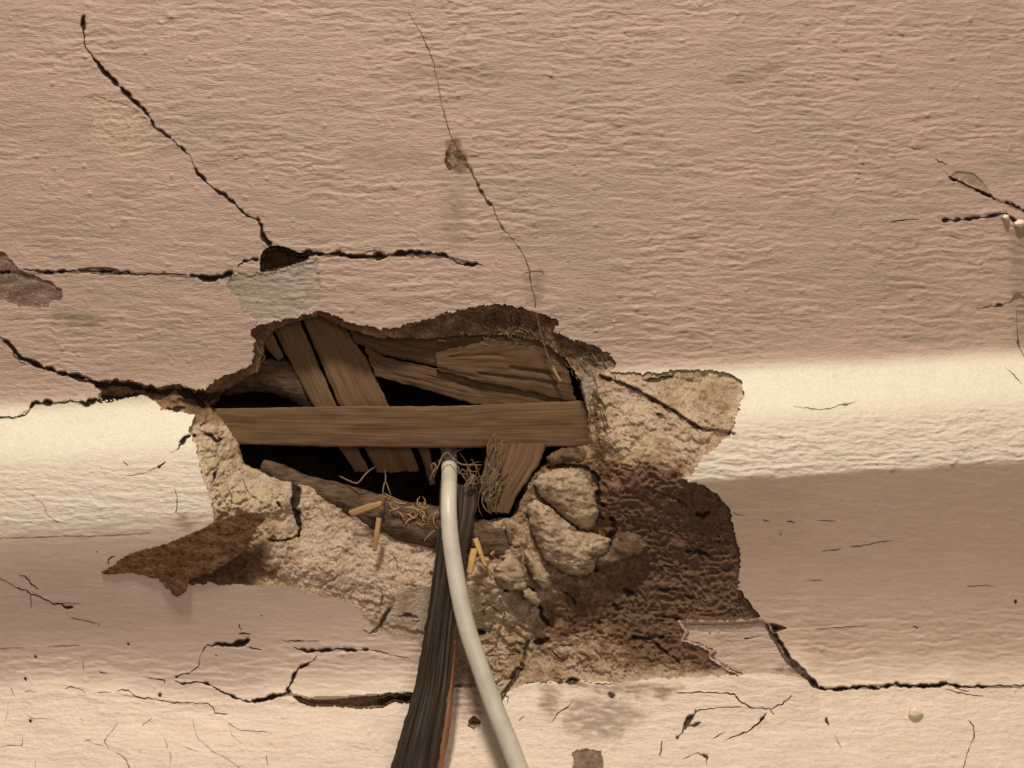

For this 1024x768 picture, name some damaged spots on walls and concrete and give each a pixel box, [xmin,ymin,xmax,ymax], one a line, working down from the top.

crack [0,15,271,281]
crack [936,159,1024,222]
peeling [0,252,62,308]
peeling [225,245,339,406]
crack [304,250,482,266]
spalling [347,330,480,406]
crack [599,375,736,435]
flaking render [88,378,441,648]
flaking render [457,366,802,696]
crack [0,551,420,768]
flaking render [449,623,477,688]
crack [659,634,1024,768]